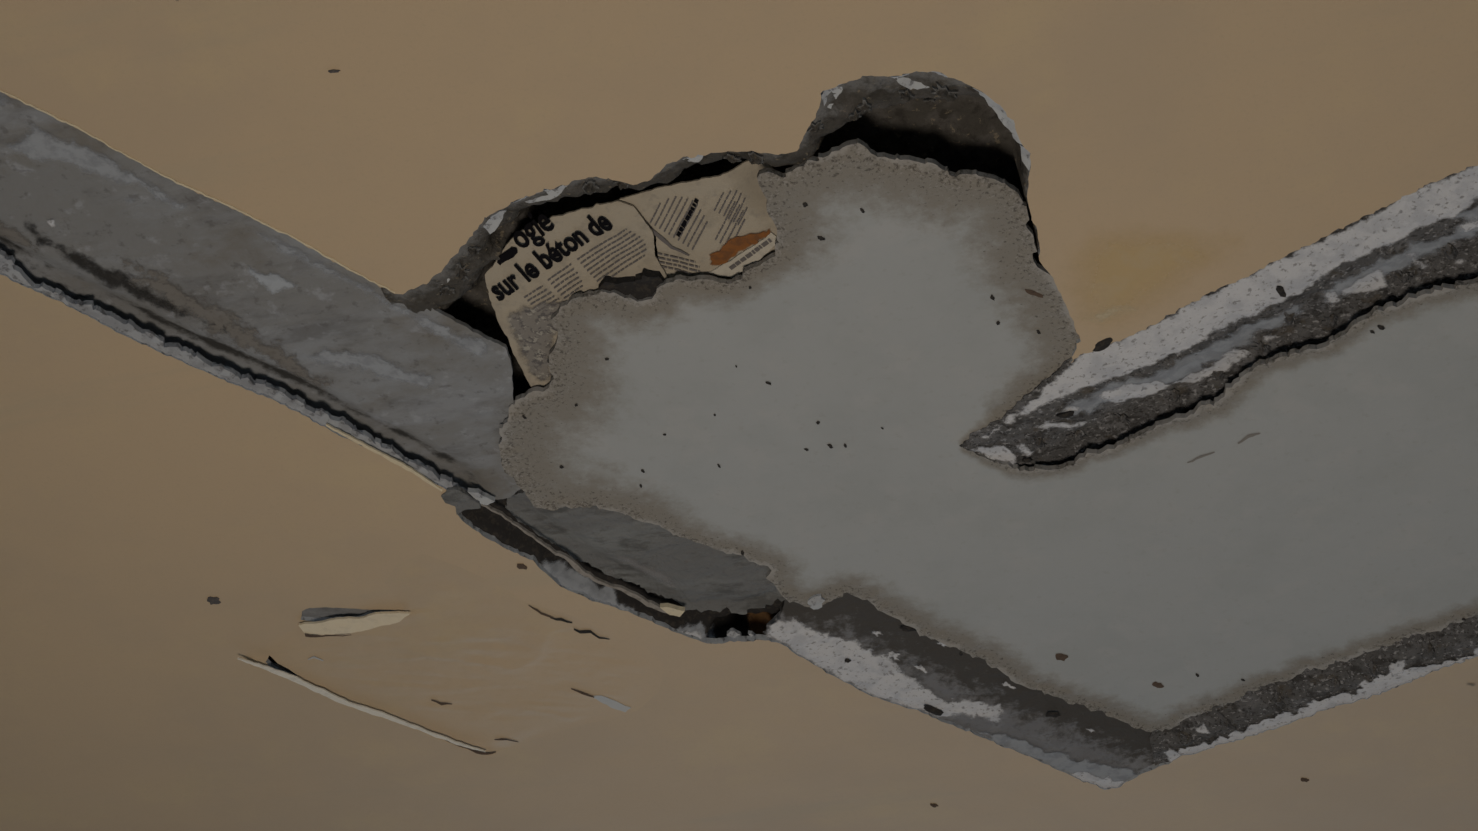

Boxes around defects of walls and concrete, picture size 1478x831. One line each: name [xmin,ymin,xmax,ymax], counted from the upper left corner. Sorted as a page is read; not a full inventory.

spalling [0,71,1043,617]
spalling [959,166,1478,467]
peeling [707,593,1478,788]